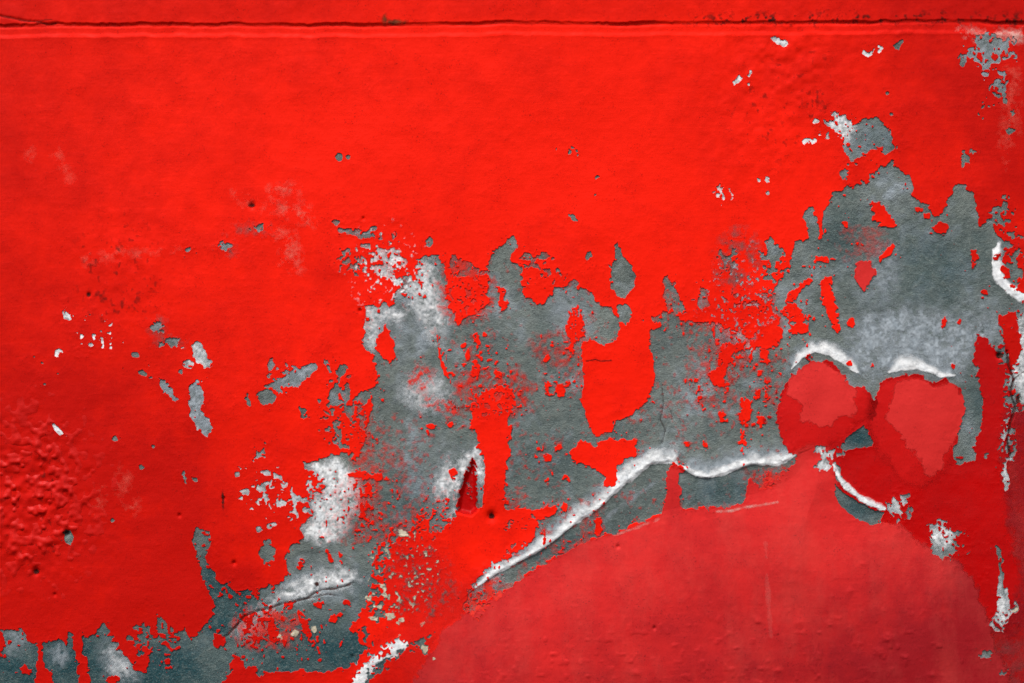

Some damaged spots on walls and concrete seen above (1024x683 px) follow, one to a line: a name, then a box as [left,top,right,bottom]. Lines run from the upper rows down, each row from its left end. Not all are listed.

peeling [957,33,1017,135]
peeling [79,111,1024,683]
crack [226,583,350,636]